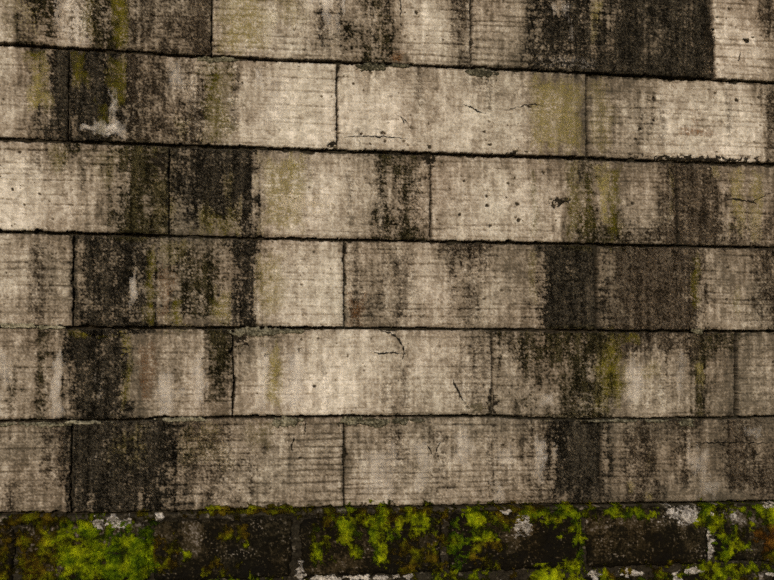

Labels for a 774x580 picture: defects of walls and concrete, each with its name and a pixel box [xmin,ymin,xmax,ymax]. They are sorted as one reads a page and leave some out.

water stain [521,0,714,78]
water stain [15,0,261,512]
crack [374,330,405,359]
water stain [490,163,774,503]